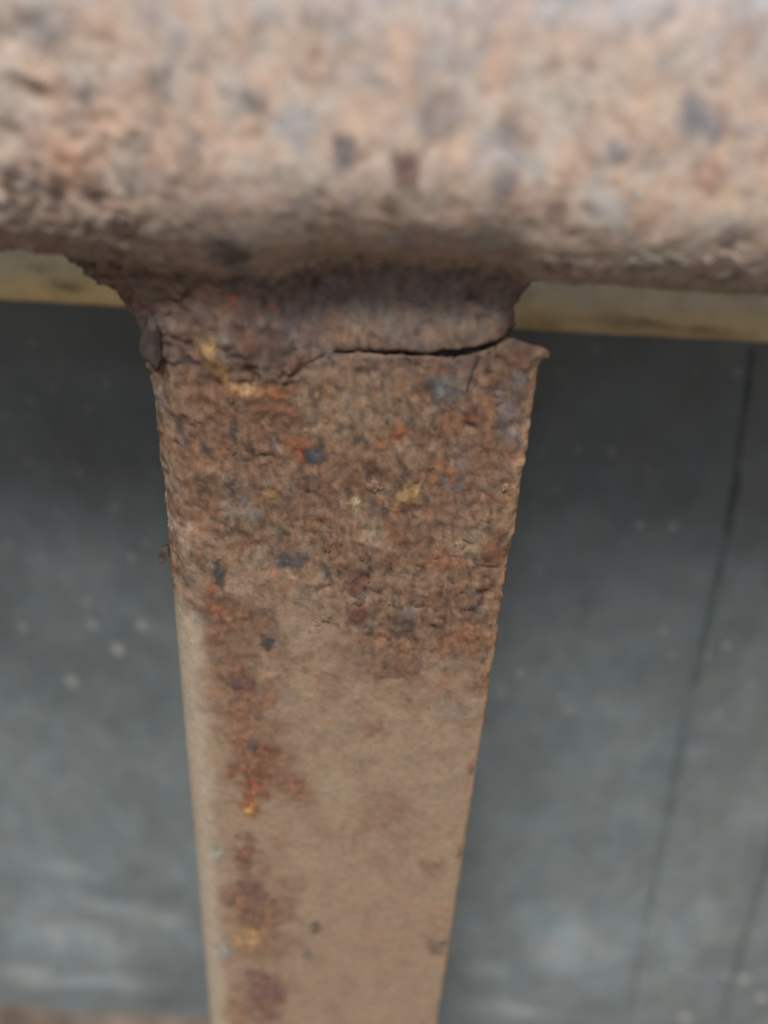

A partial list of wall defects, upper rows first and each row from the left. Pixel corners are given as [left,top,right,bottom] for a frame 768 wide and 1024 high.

corrosion [201,338,297,421]
crack [281,328,510,392]
corrosion [323,555,424,641]